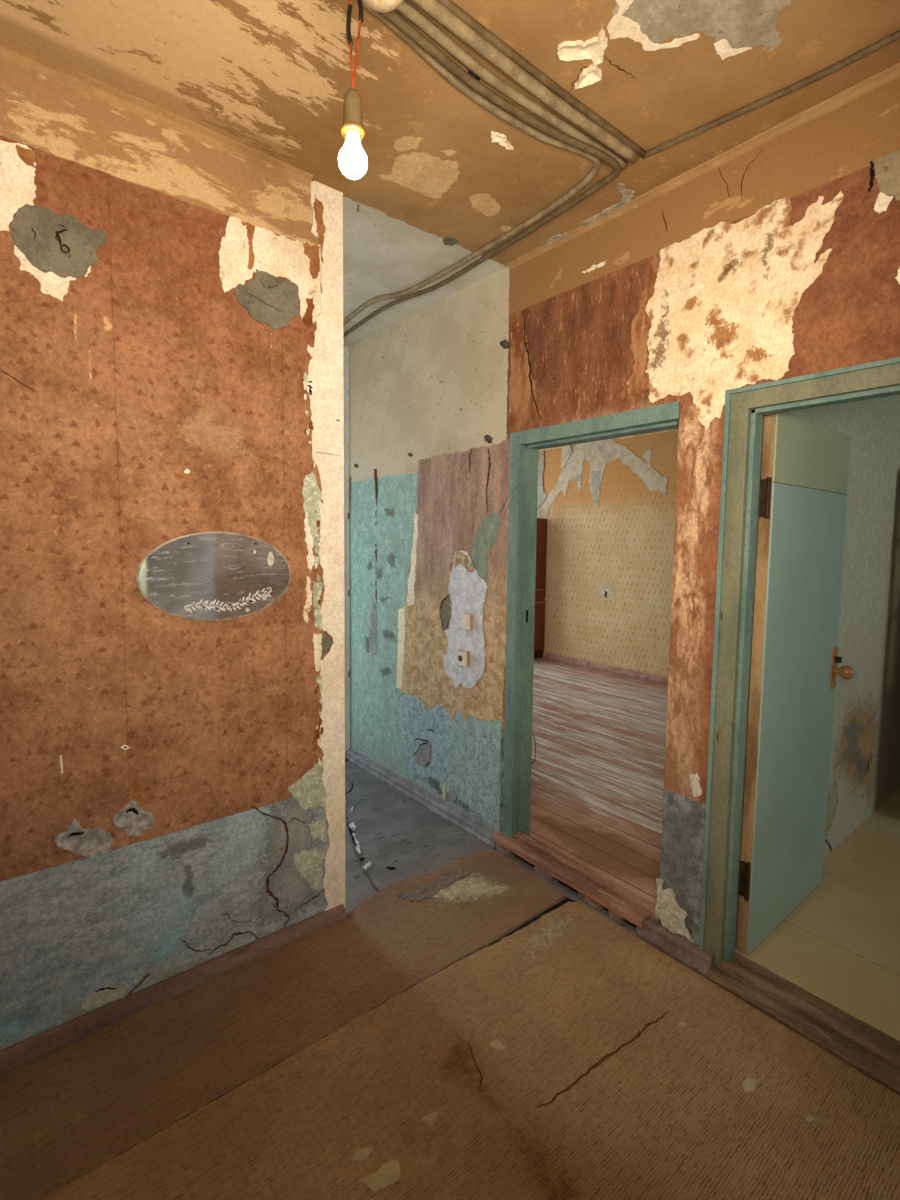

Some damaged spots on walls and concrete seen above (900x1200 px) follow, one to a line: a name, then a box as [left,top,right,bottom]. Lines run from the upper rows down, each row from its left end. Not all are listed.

peeling [557,0,793,89]
flaking render [868,150,900,214]
flaking render [14,244,91,301]
peeling [302,196,325,279]
flaking render [645,191,844,430]
flaking render [537,439,668,519]
flaking render [250,463,333,926]
peeling [380,512,500,827]
leakage [825,701,879,837]
crack [180,807,325,956]
crack [468,1043,484,1088]
crack [537,1012,668,1108]